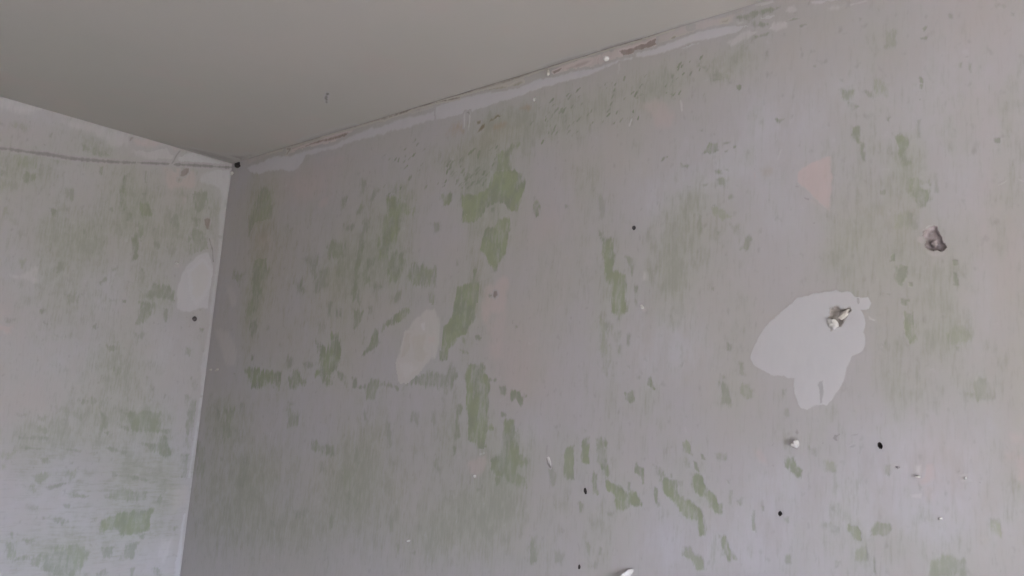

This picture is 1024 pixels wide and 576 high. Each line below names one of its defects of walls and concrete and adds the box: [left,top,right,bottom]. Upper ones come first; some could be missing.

spalling [916,224,948,260]
peeling [827,309,850,330]